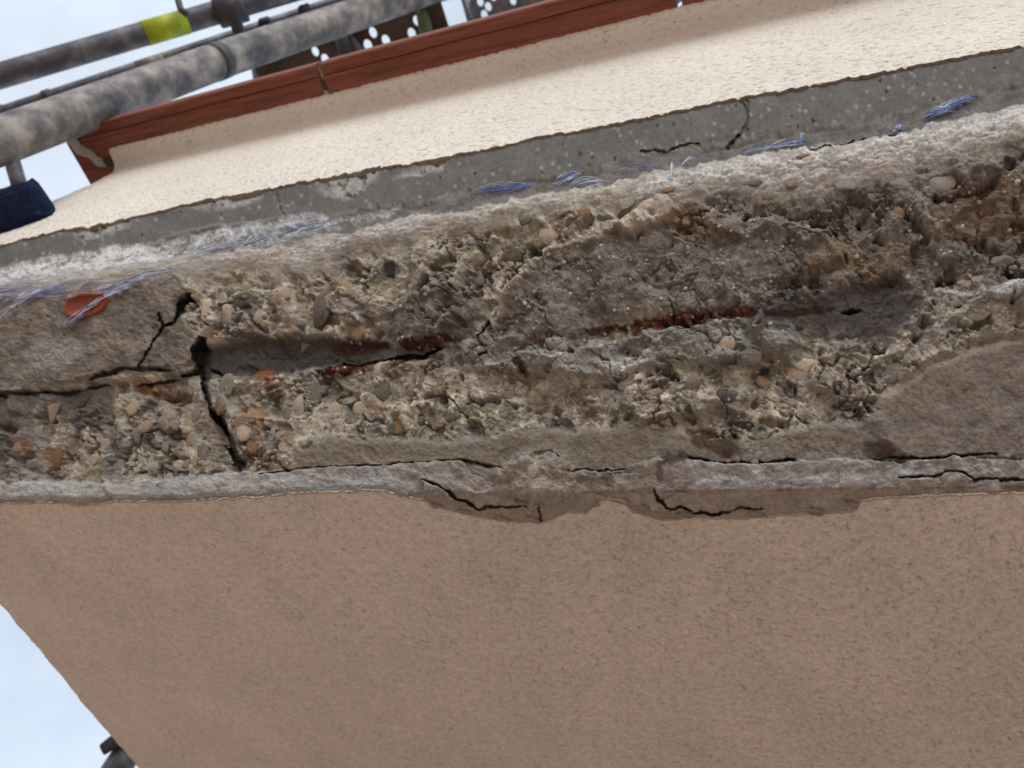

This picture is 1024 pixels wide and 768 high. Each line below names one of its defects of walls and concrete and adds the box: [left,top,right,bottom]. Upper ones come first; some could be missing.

crack [726,100,750,150]
crack [641,143,699,154]
spalling [0,83,1024,485]
rust [586,305,835,336]
rust [317,333,454,380]
rust [512,356,526,375]
crack [0,292,542,522]
crack [884,453,1024,482]
flaking render [394,488,862,523]
crack [654,490,757,517]